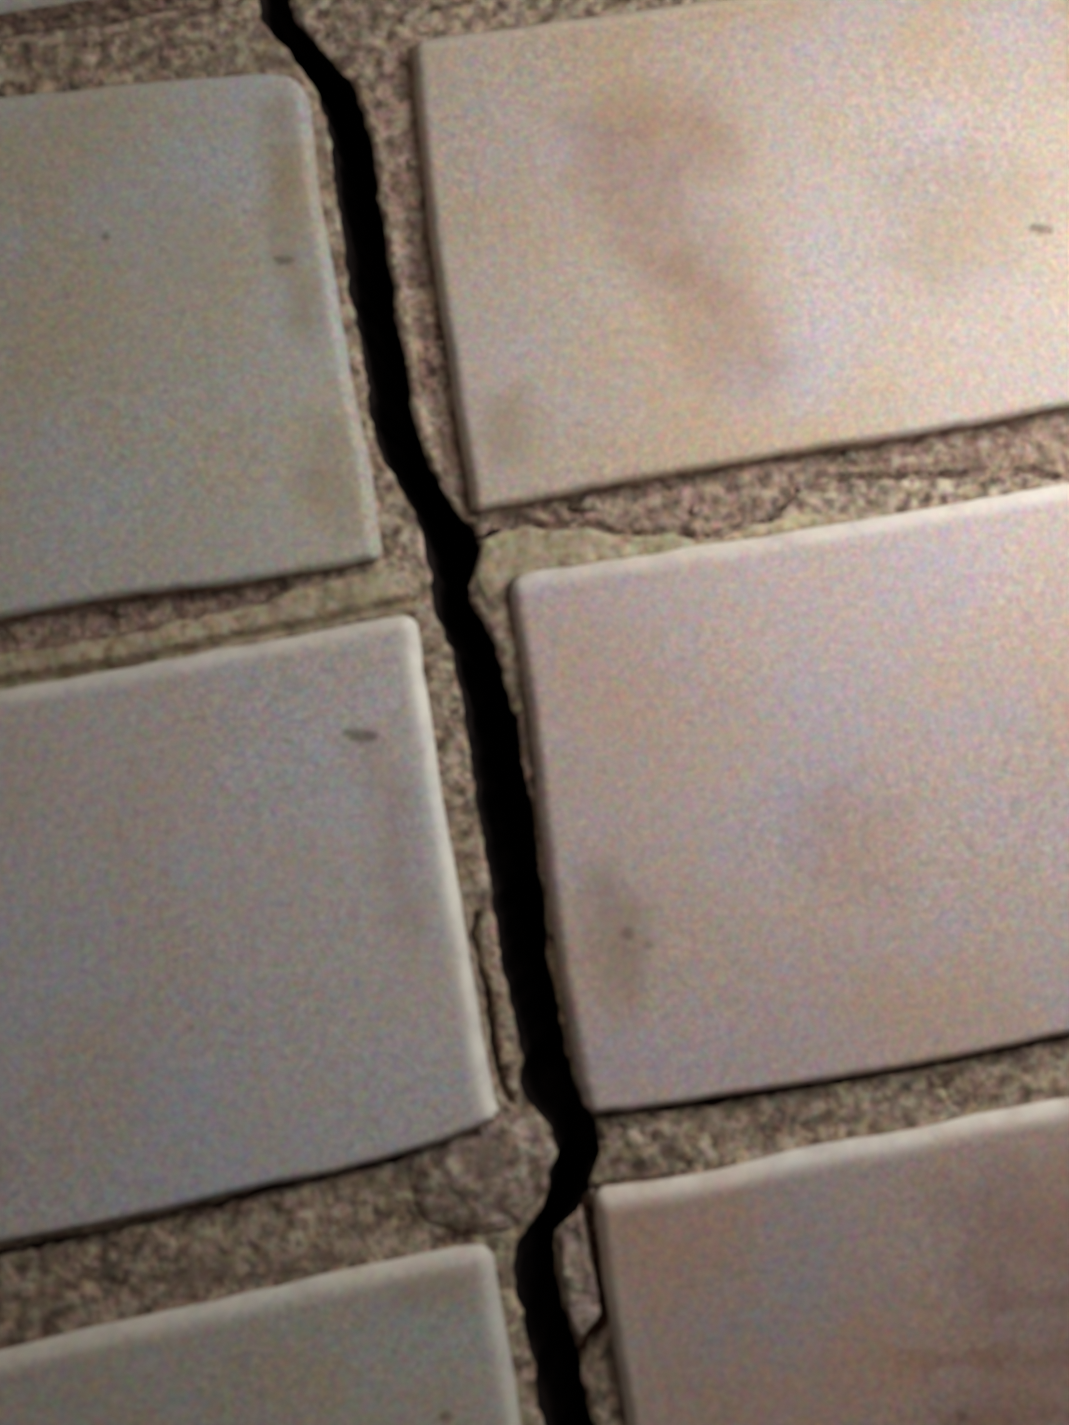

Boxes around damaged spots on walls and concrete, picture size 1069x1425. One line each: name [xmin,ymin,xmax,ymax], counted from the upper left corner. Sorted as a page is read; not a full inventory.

crack [259,0,1069,1425]